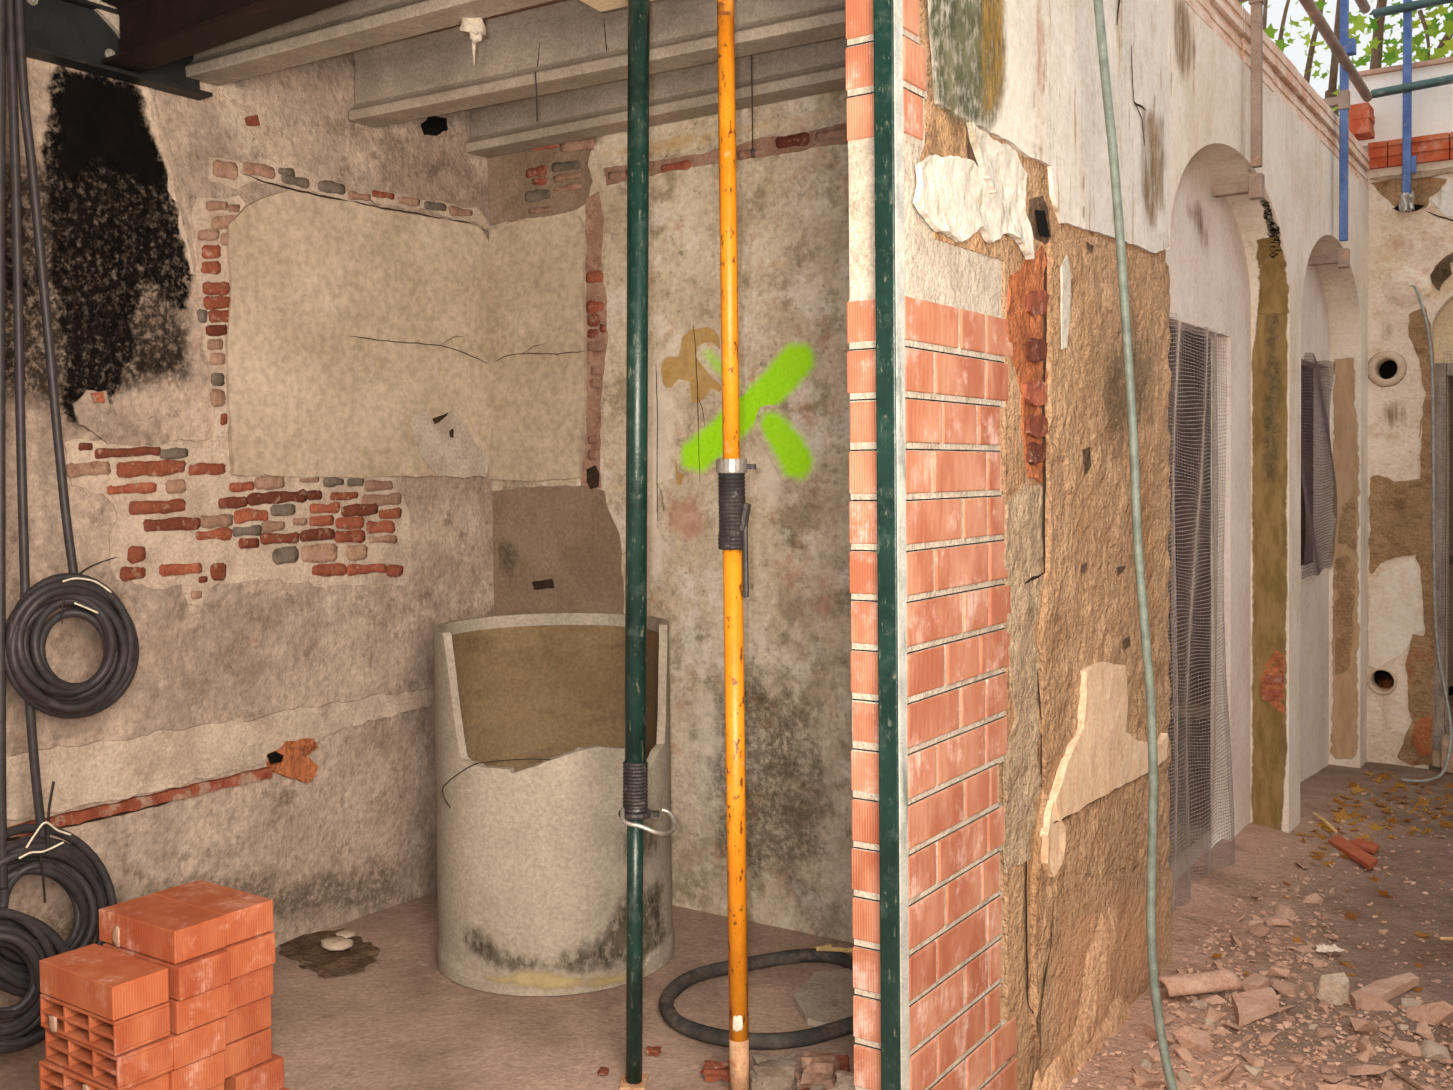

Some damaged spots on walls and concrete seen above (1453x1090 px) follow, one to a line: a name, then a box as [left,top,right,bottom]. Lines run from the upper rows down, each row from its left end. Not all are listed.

damp [929,0,1005,126]
flaking render [649,123,848,176]
flaking render [63,137,627,605]
crack [352,336,582,363]
peeling [912,108,1052,483]
spalling [1430,252,1453,291]
spalling [1083,447,1091,474]
spalling [1332,306,1436,766]